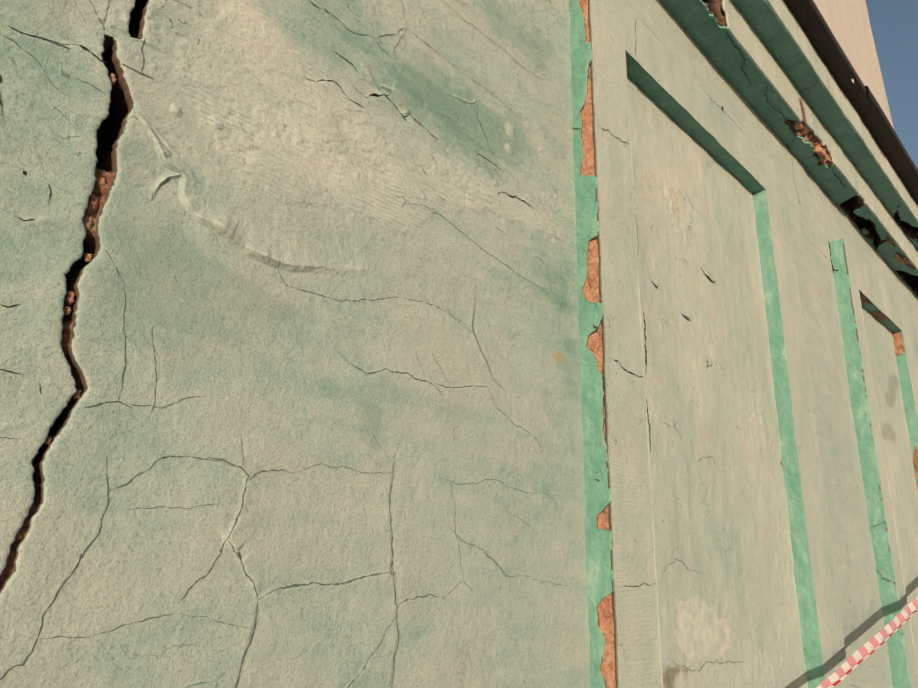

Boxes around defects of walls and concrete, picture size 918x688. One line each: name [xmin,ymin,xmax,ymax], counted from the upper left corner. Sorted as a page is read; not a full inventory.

spalling [702,0,726,26]
spalling [581,62,595,175]
spalling [785,120,833,167]
crack [0,0,205,589]
crack [278,269,542,448]
spalling [582,236,604,386]
spalling [859,292,888,320]
spalling [839,195,918,295]
spalling [892,332,905,356]
crack [0,434,566,688]
spalling [597,505,610,530]
spalling [597,593,616,688]